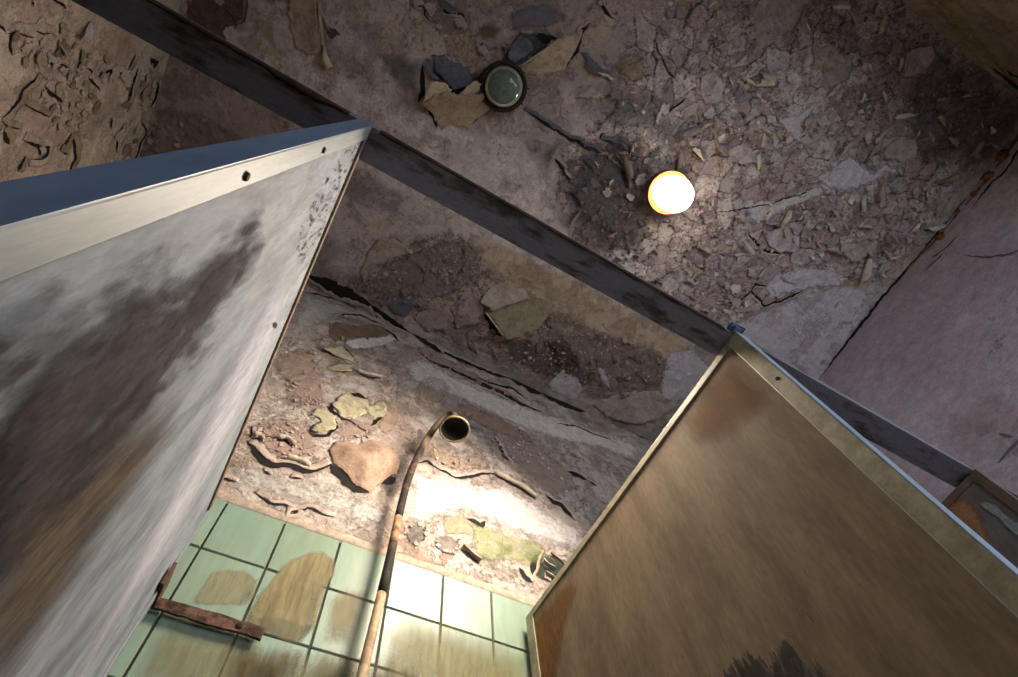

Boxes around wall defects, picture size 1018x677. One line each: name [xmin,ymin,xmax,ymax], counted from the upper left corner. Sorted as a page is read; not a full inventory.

peeling [12,21,241,160]
peeling [409,0,670,129]
crack [654,39,688,117]
flaking render [550,0,961,320]
crack [746,233,780,257]
peeling [368,239,709,424]
crack [716,283,813,309]
flaking render [235,468,385,527]
peeling [250,371,398,467]
flaking render [404,346,641,582]
leakage [196,552,334,642]
leakage [158,629,517,677]